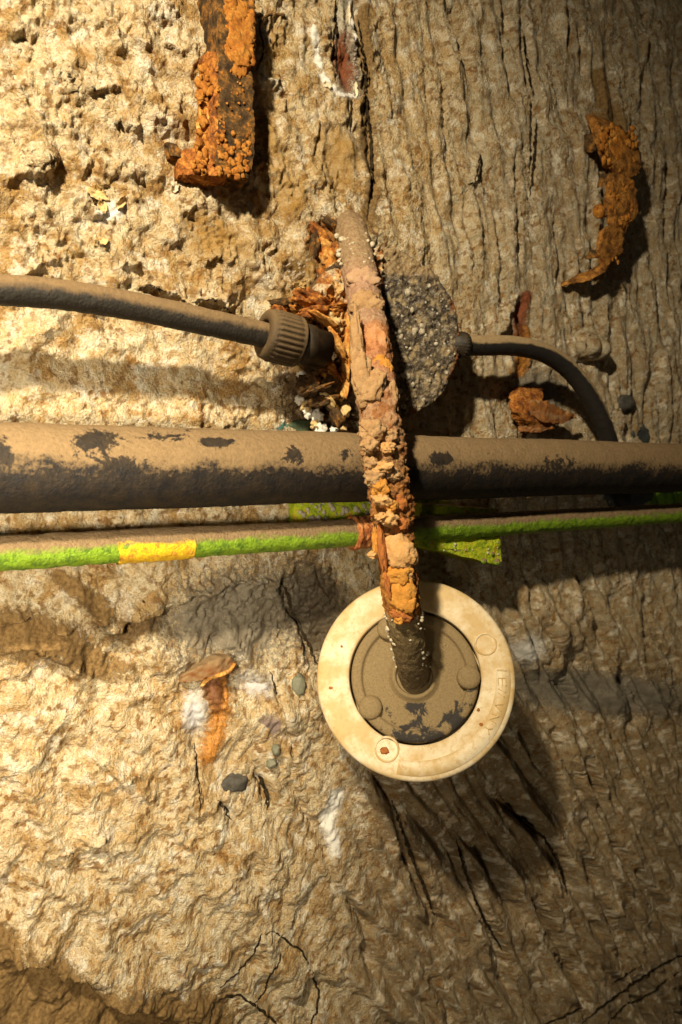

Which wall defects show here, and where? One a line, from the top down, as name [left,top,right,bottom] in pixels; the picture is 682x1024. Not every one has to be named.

rust [164,0,257,193]
rust [512,291,533,338]
rust [513,356,530,379]
rust [197,662,236,771]
crack [546,955,682,1024]